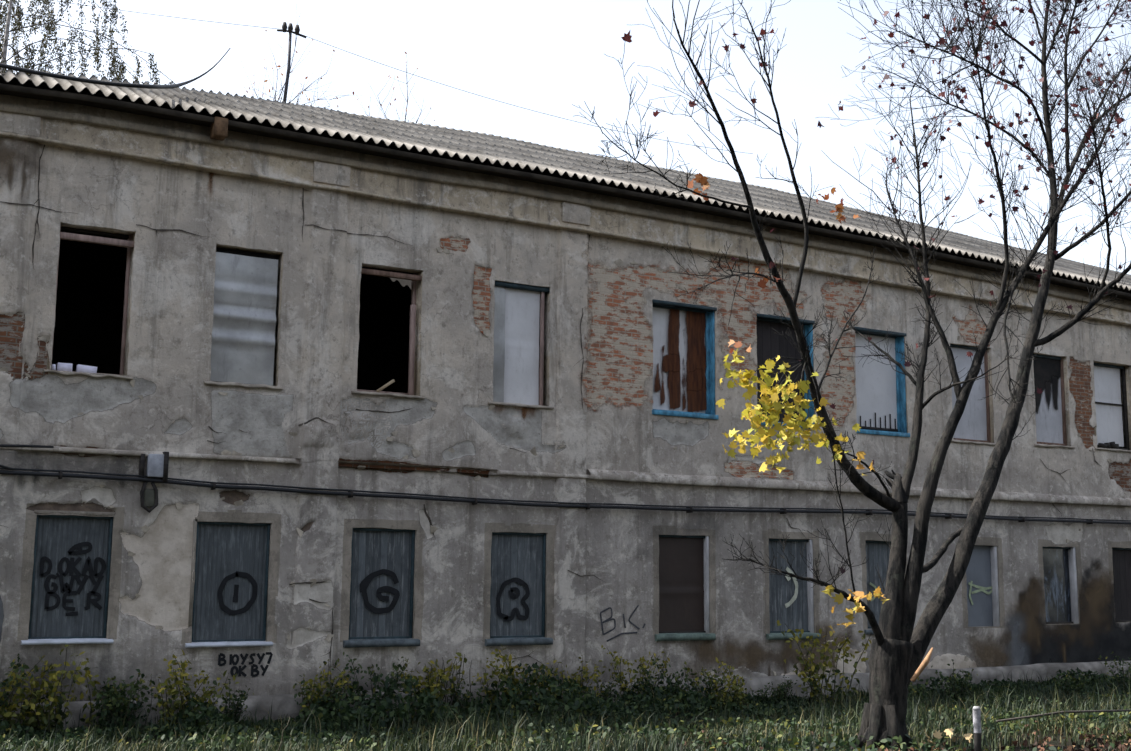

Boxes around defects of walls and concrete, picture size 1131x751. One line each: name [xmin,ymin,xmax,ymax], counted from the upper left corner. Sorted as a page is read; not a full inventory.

crack [0,145,77,268]
crack [136,224,208,240]
flaking render [436,236,470,253]
flaking render [0,312,156,424]
flaking render [472,265,492,338]
flaking render [582,250,807,412]
flaking render [814,276,872,428]
flaking render [1068,357,1096,453]
flaking render [27,484,116,514]
flaking render [1107,458,1131,494]
flaking render [119,503,199,631]
water stain [973,561,1131,667]